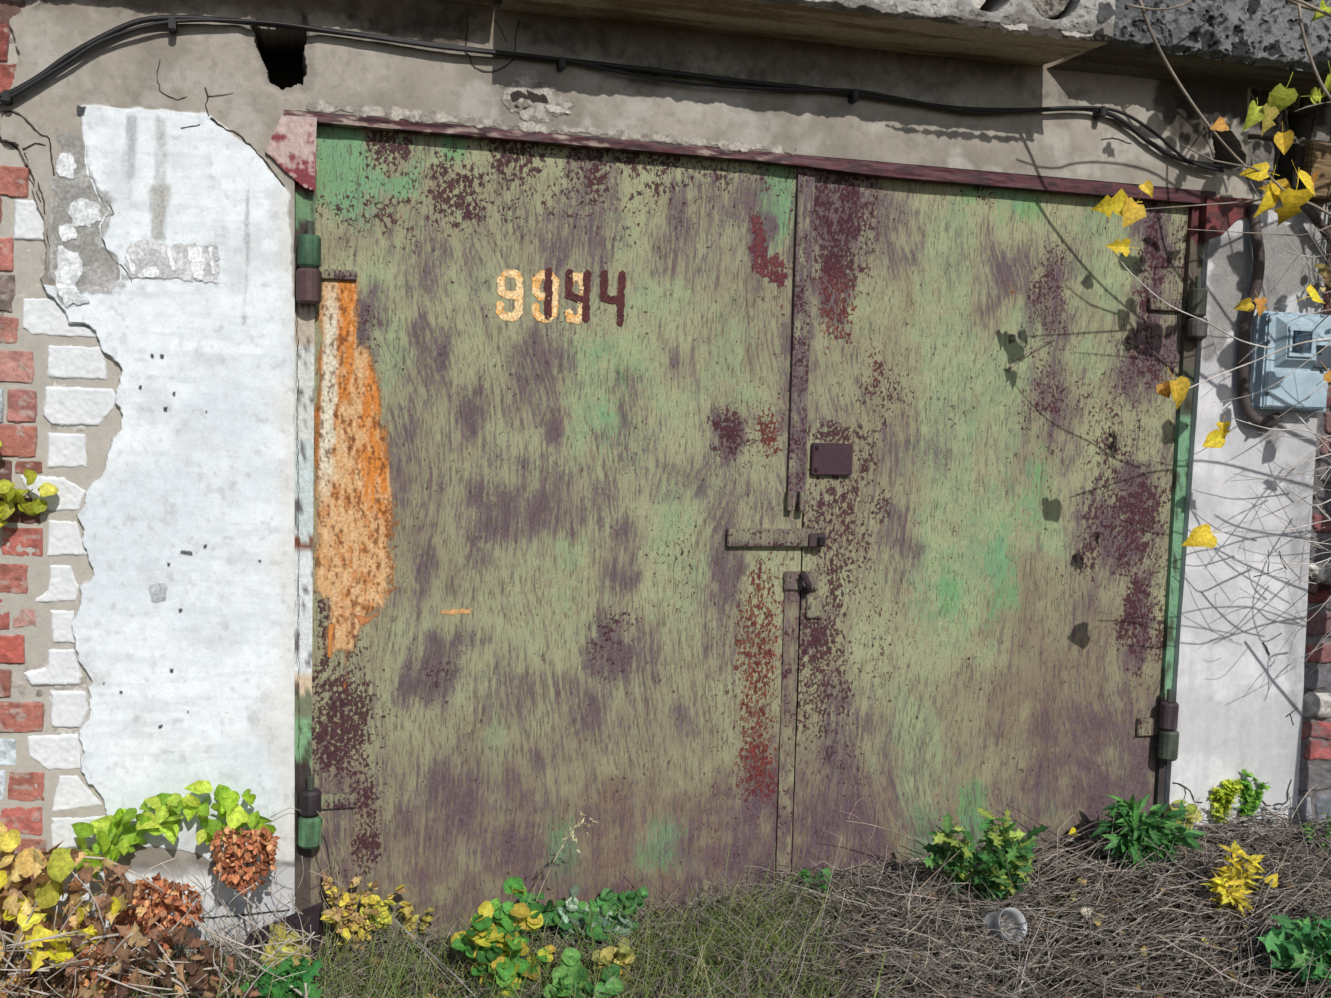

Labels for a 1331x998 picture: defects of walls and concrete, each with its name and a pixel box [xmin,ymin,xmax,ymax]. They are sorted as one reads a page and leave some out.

spalling [306,76,797,155]
corrosion [746,213,788,325]
corrosion [818,277,847,340]
spalling [13,133,219,945]
corrosion [314,279,400,689]
corrosion [729,559,778,803]